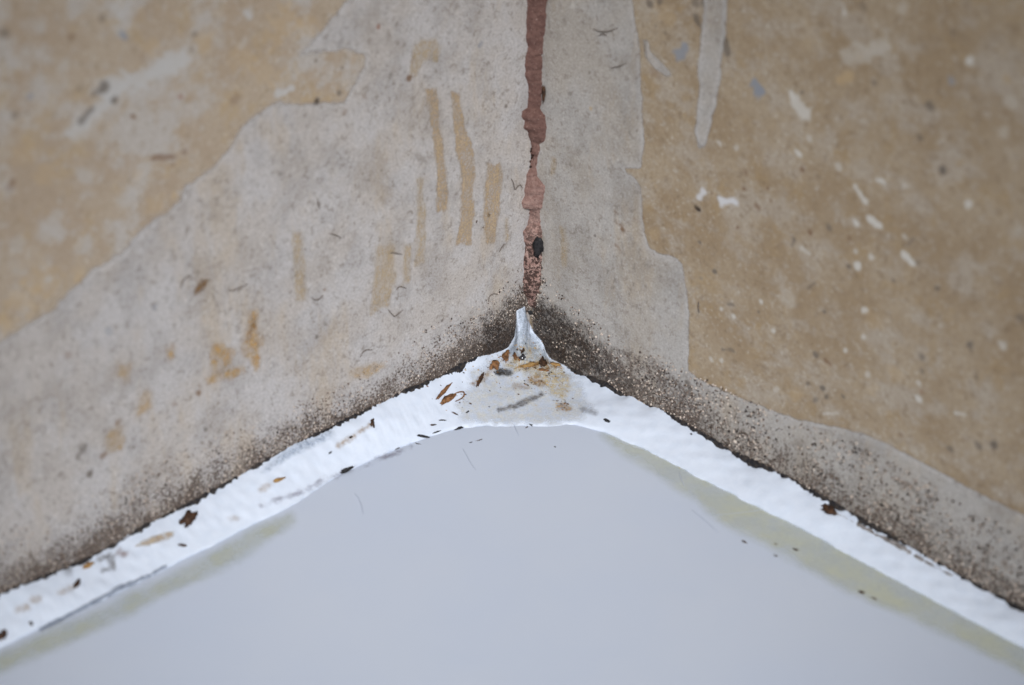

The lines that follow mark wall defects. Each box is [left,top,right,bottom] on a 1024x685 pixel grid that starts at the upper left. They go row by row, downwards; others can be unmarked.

peeling [0,0,532,590]
damp [373,89,448,309]
damp [452,93,508,245]
damp [0,267,1024,612]
peeling [532,0,1024,604]
damp [954,621,1024,668]